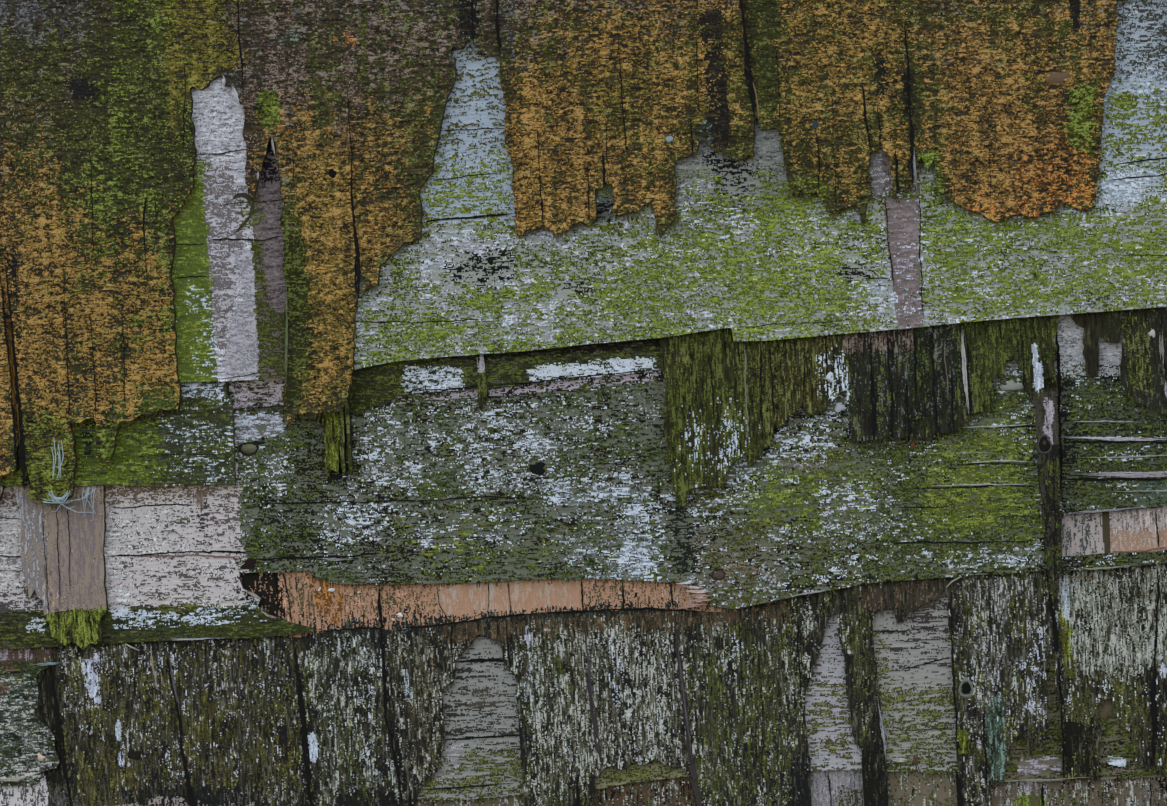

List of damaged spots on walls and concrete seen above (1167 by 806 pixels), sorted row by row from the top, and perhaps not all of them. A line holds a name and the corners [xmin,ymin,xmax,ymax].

crack [0,262,26,485]
peeling [0,647,52,666]
leakage [144,0,771,359]
peeling [415,635,525,806]
peeling [0,0,1167,637]
leakage [0,197,1167,806]